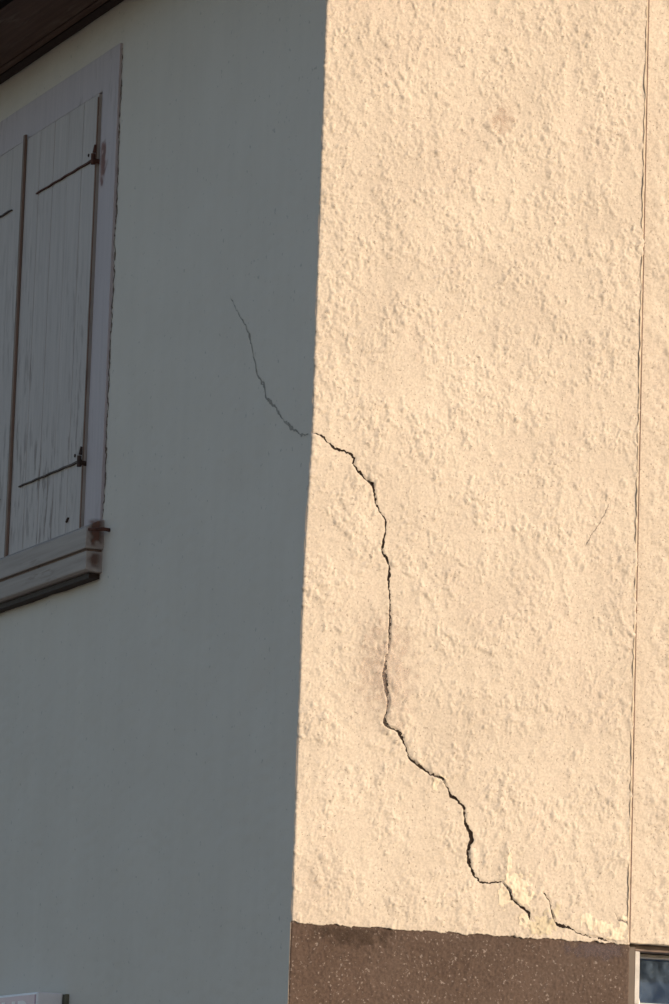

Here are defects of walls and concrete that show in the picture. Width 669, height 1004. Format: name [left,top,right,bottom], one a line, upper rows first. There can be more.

crack [230,297,626,943]